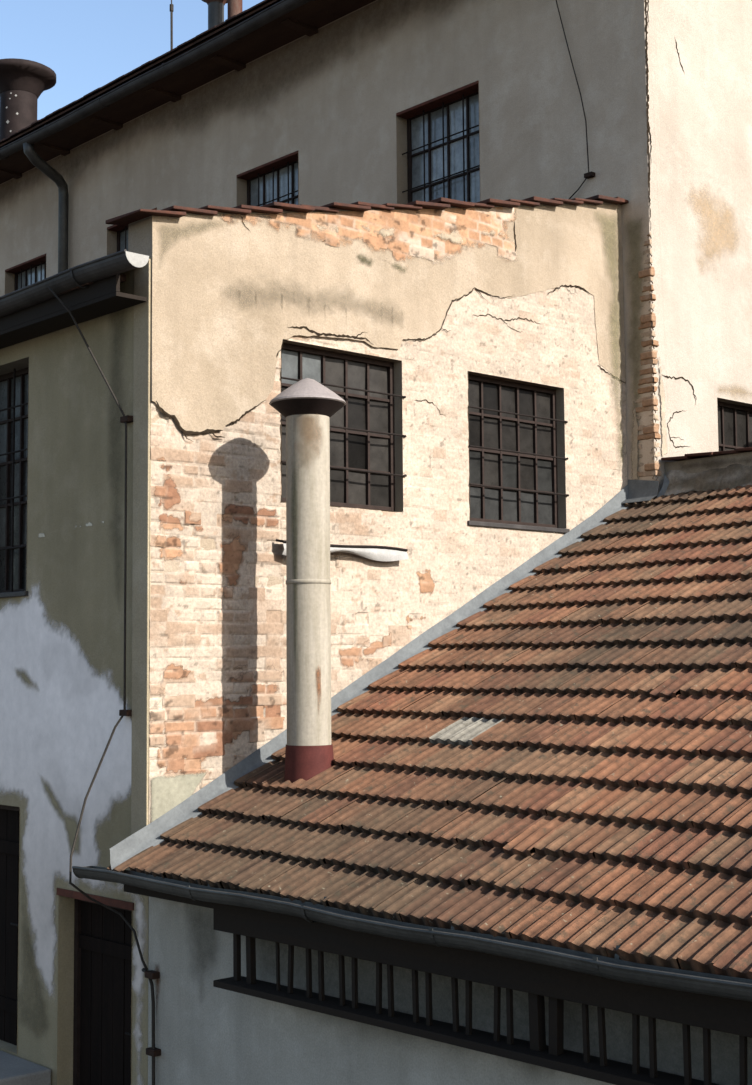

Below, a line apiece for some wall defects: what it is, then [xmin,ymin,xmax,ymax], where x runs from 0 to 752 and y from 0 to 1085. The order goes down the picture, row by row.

crack [644,0,652,230]
flaking render [222,207,517,262]
crack [277,326,374,356]
crack [405,287,540,340]
crack [548,285,590,296]
crack [156,401,264,441]
crack [663,375,697,448]
peeling [149,232,668,823]
peeling [0,587,132,994]
peeling [132,895,145,1051]